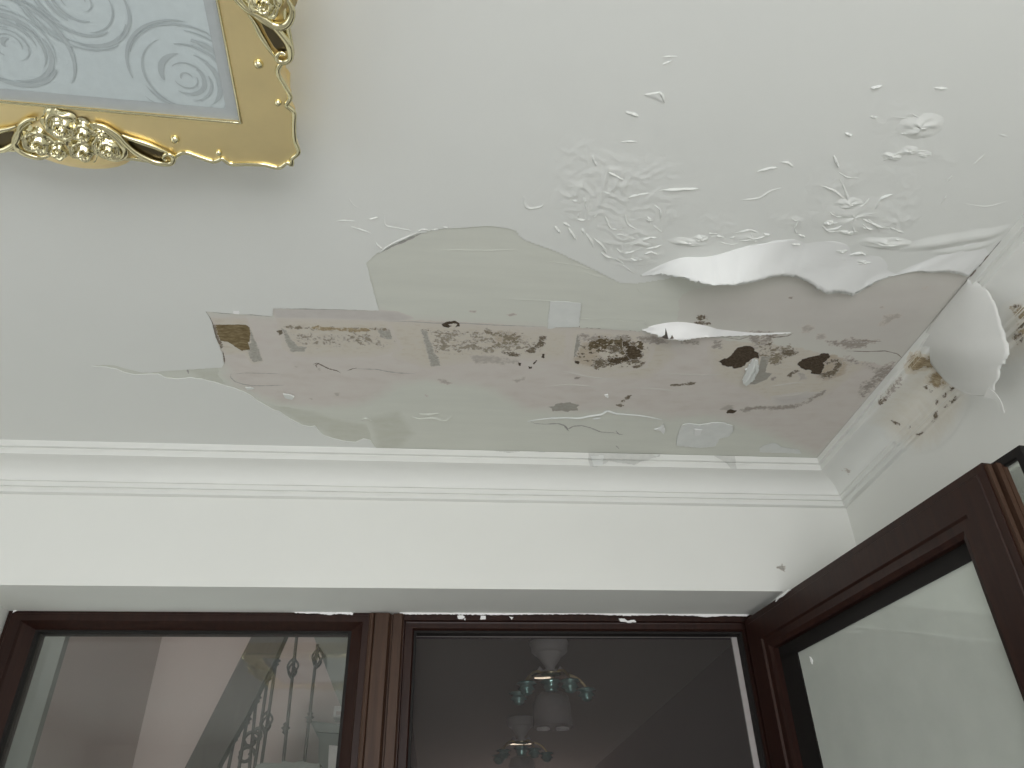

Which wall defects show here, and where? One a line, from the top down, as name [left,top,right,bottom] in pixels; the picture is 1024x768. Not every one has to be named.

leakage [211,317,264,365]
leakage [276,325,397,352]
leakage [420,321,547,386]
flaking render [97,226,1009,467]
leakage [568,324,970,455]